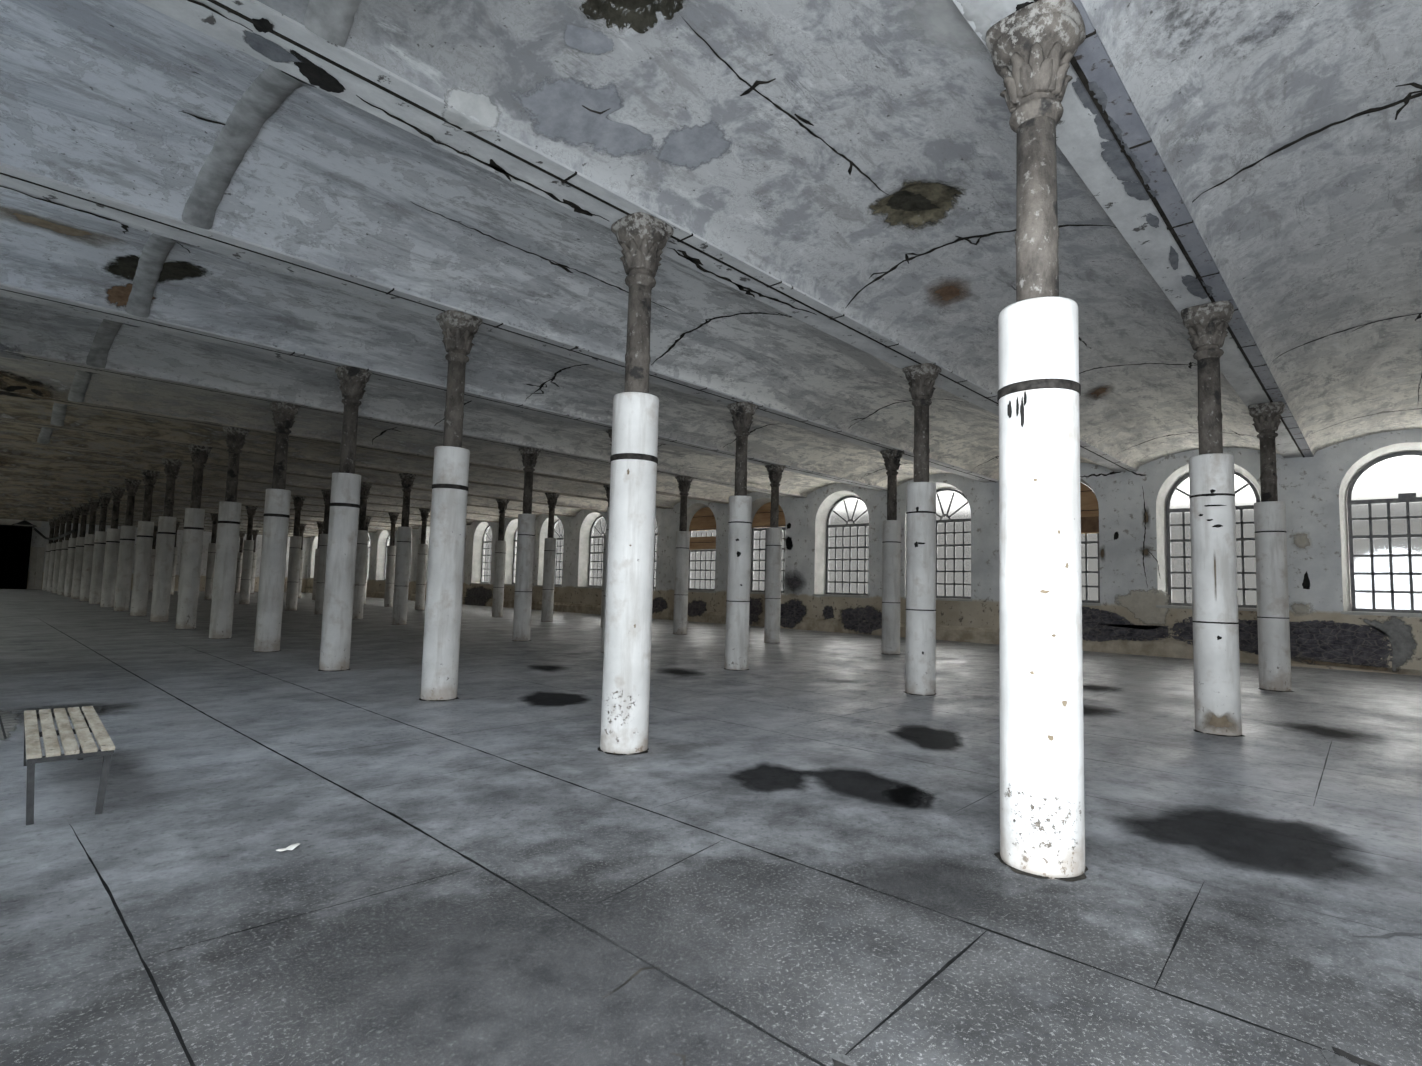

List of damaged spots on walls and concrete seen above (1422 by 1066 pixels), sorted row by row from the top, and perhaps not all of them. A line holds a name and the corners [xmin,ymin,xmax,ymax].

hole [563,0,683,55]
crack [356,95,611,221]
peeling [511,78,731,170]
crack [682,17,890,196]
crack [1192,82,1422,203]
spalling [869,181,962,229]
crack [410,201,1016,365]
flaking render [1082,589,1193,645]
flaking render [1289,616,1417,671]
damp [892,726,961,750]
damp [732,764,934,808]
damp [1123,810,1368,878]